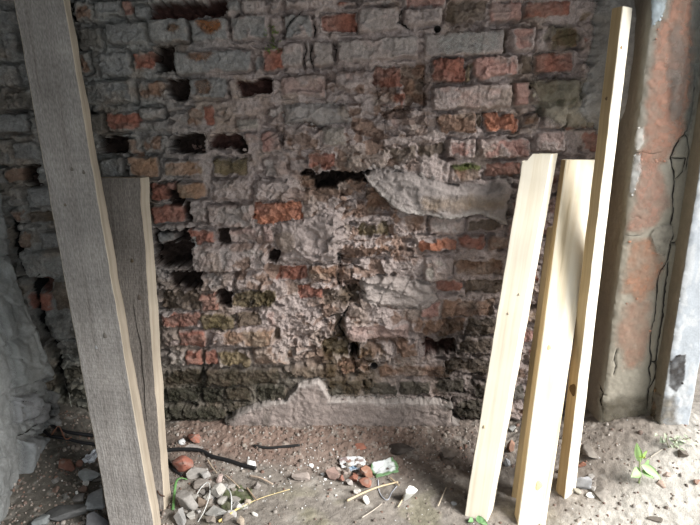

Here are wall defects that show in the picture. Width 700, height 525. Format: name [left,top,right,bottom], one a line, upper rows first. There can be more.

spalling [147,0,228,21]
spalling [154,46,191,101]
spalling [237,78,274,97]
spalling [168,132,248,156]
peeling [302,164,514,225]
spalling [152,228,236,312]
spalling [281,220,401,306]
crack [637,88,695,402]
spalling [286,315,372,375]
peeling [224,377,460,428]
leakage [436,319,489,419]
peeling [670,355,686,392]